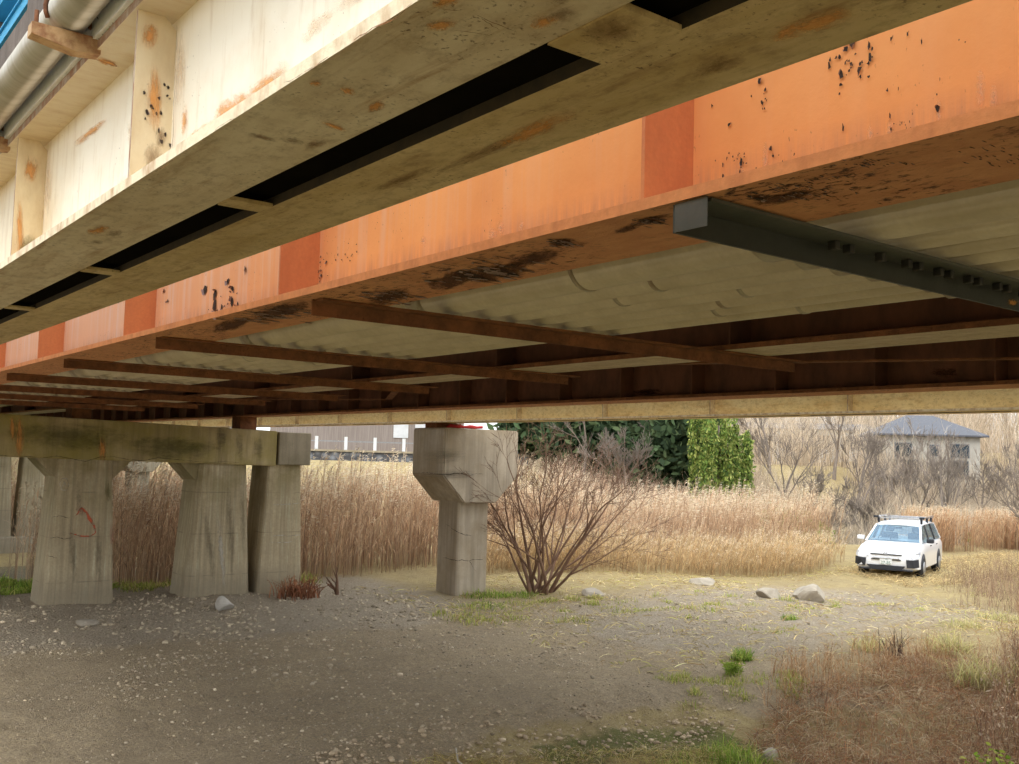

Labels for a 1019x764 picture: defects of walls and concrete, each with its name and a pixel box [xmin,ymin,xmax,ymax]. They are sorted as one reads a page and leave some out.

corrosion [149,78,159,117]
corrosion [747,159,915,205]
corrosion [617,216,668,233]
corrosion [356,239,583,305]